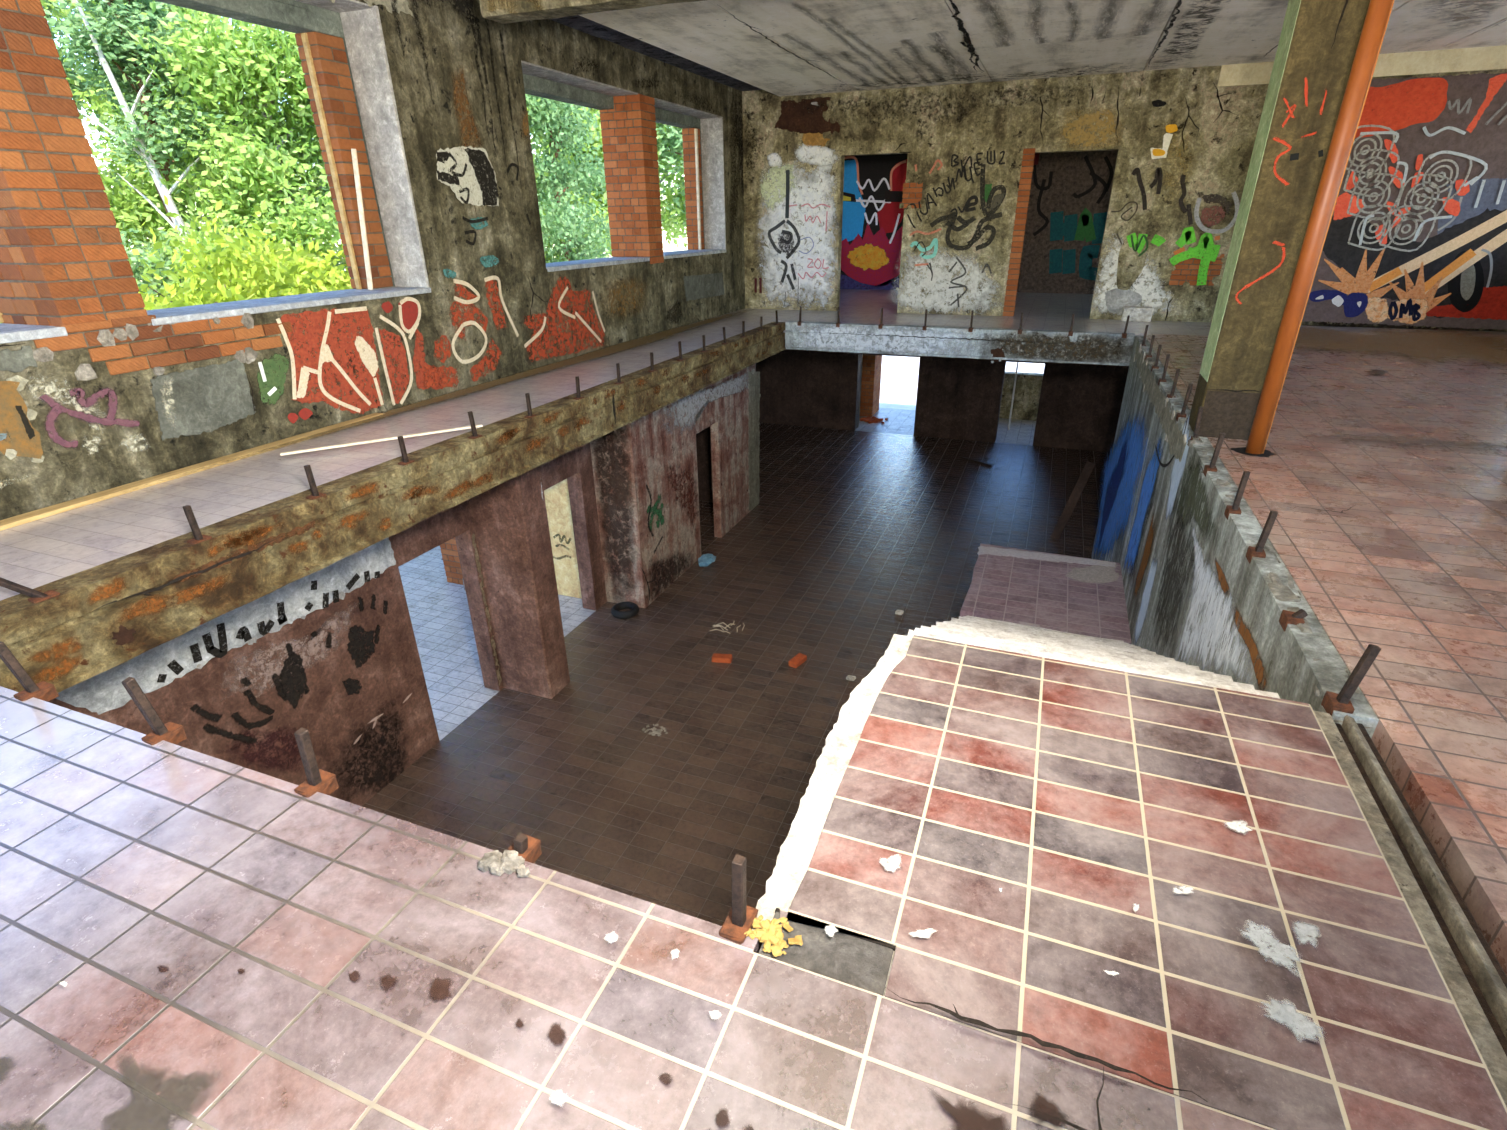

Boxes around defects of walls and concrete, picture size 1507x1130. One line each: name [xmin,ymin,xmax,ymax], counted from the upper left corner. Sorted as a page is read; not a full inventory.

flaking render [358,0,414,17]
crack [949,0,984,73]
rust [497,389,625,453]
rust [340,482,391,530]
rust [403,473,493,501]
rust [209,526,273,557]
rust [89,576,225,619]
rust [32,638,82,683]
damp [0,1057,9,1080]
crack [885,987,1207,1130]
damp [106,1058,211,1130]
damp [6,1120,45,1130]